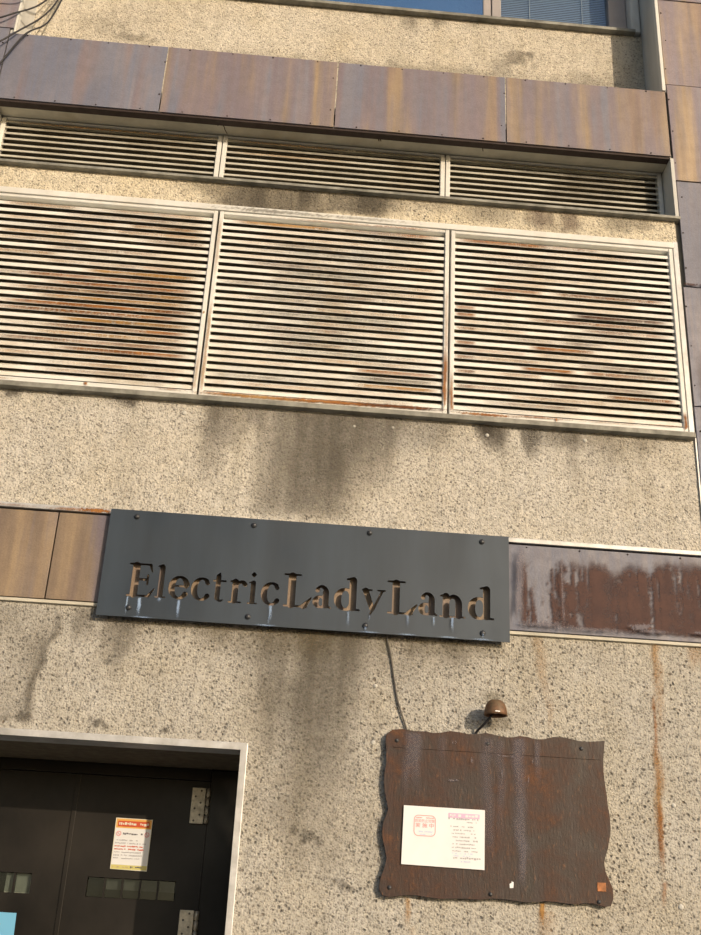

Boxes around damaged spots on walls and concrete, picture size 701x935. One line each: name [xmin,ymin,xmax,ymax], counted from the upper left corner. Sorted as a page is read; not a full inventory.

rust [11,269,190,357]
rust [562,294,654,303]
rust [561,315,661,335]
rust [612,390,671,403]
rust [522,566,537,626]
rust [548,563,701,637]